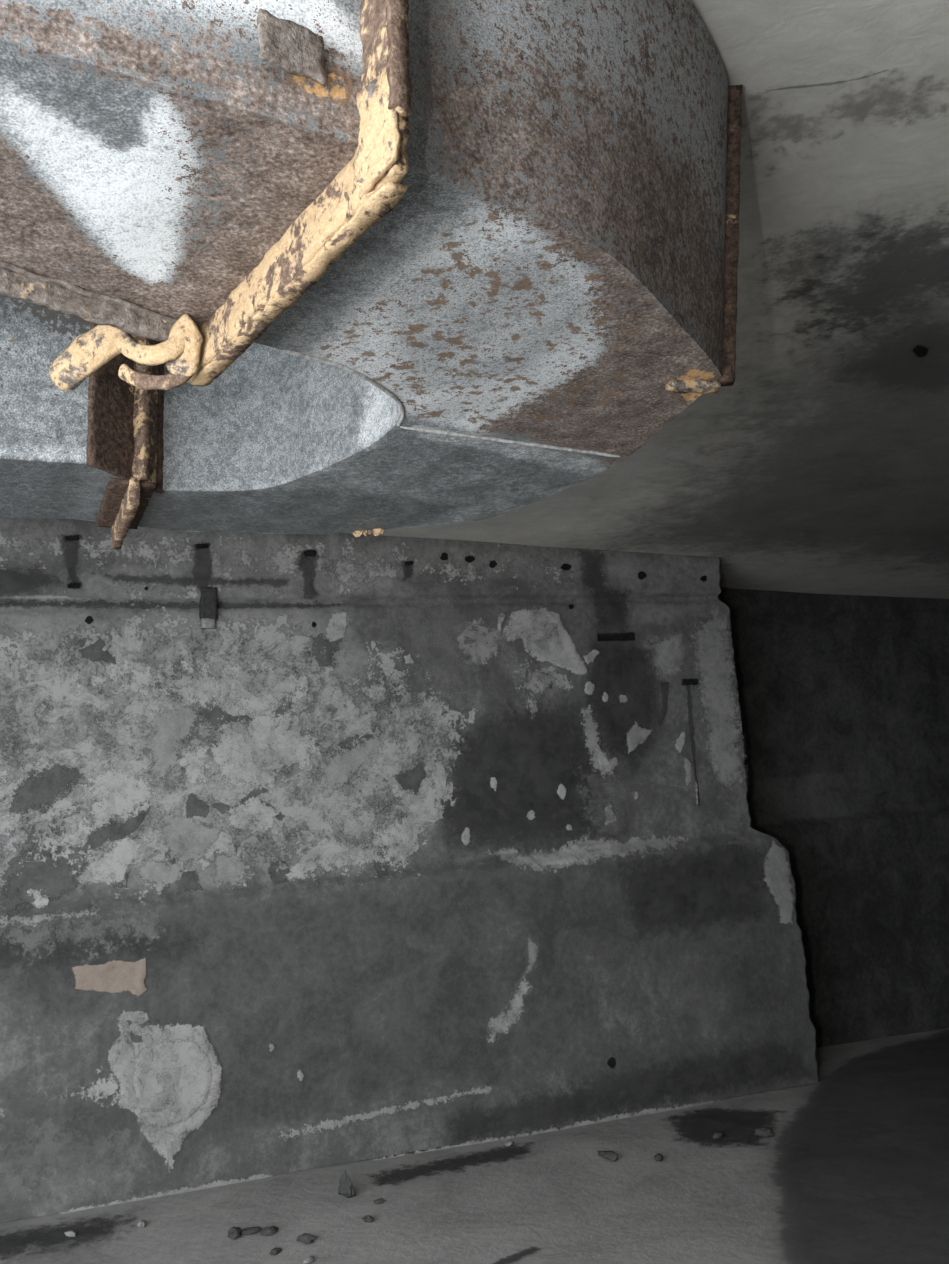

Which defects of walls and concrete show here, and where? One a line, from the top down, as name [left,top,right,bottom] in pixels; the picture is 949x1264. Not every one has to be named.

water stain [669,230,949,554]
peeling [0,526,587,1172]
spalling [450,607,689,875]
peeling [642,603,746,790]
water stain [367,1045,809,1186]
crack [492,1247,543,1264]